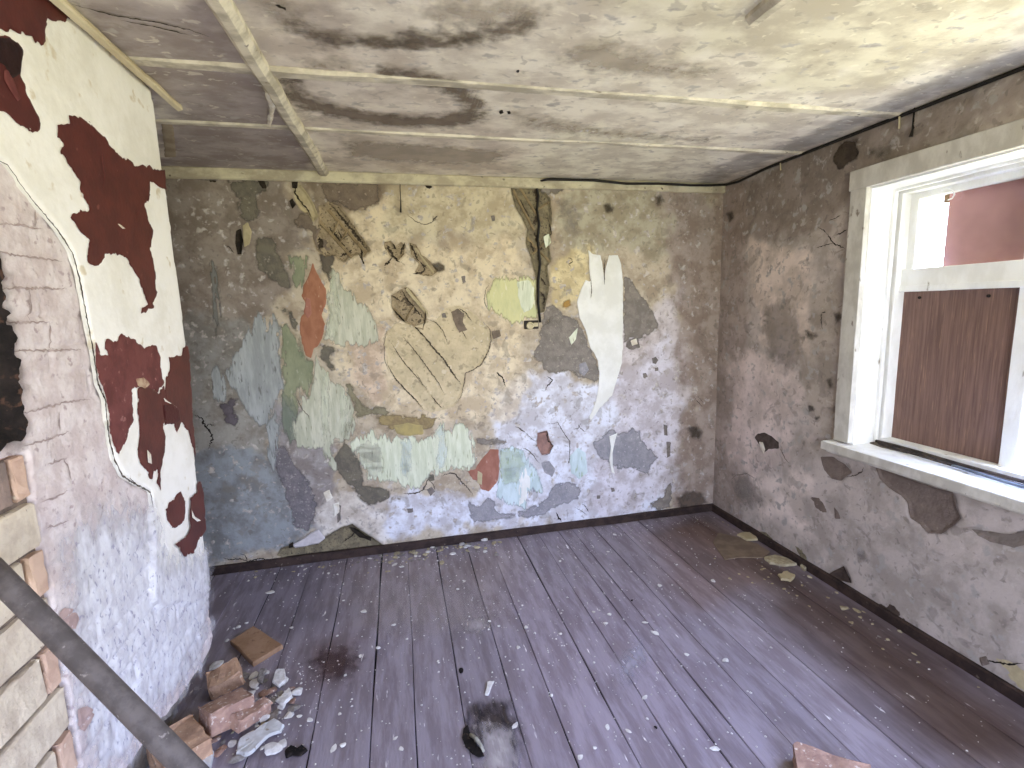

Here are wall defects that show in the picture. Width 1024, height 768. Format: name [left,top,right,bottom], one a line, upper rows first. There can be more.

peeling [0,0,70,133]
water stain [285,69,483,127]
water stain [368,40,466,50]
water stain [573,50,656,72]
peeling [57,115,167,314]
crack [817,216,846,249]
flaking render [197,179,672,557]
peeling [95,334,196,490]
flaking render [755,433,789,463]
peeling [166,481,206,557]
flaking render [876,468,961,534]
flaking render [972,529,1024,548]